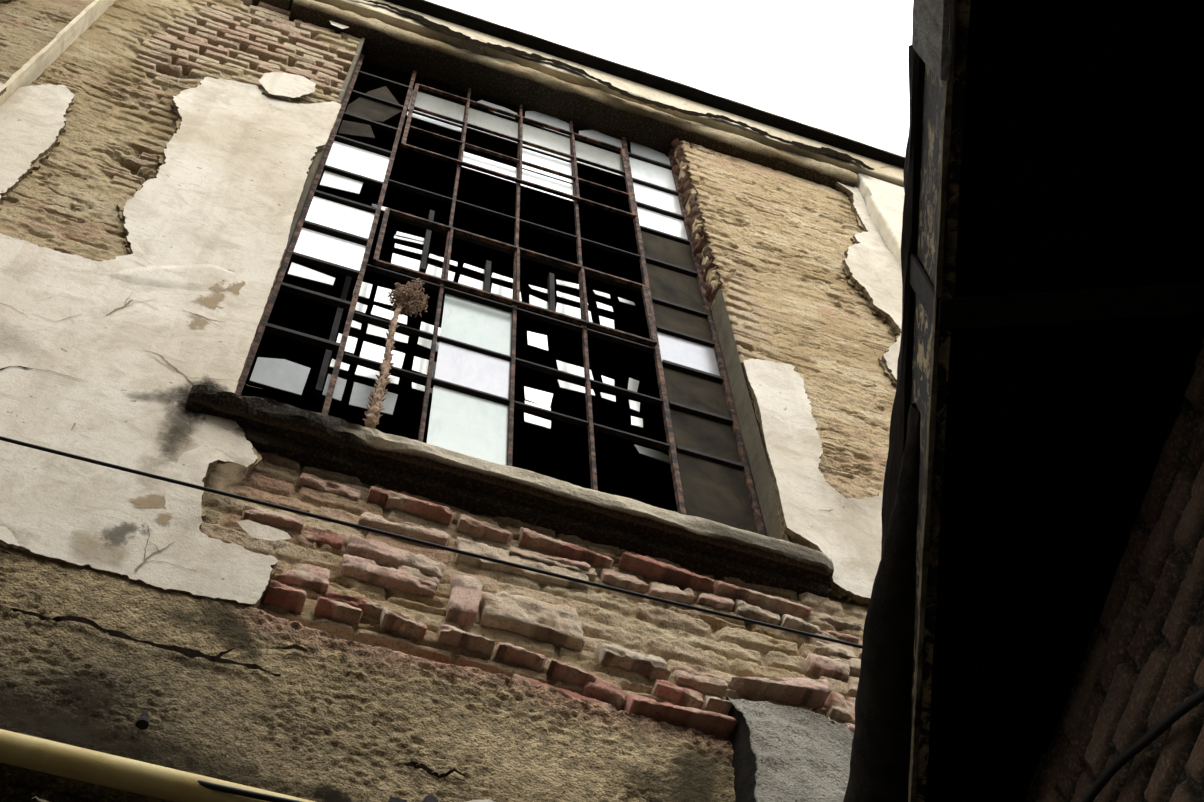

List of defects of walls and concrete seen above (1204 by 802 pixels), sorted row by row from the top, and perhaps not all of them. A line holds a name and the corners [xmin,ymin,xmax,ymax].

spalling [0,0,361,261]
crack [0,366,89,382]
crack [1,294,225,329]
spalling [667,138,896,500]
crack [0,605,314,677]
spalling [200,450,868,741]